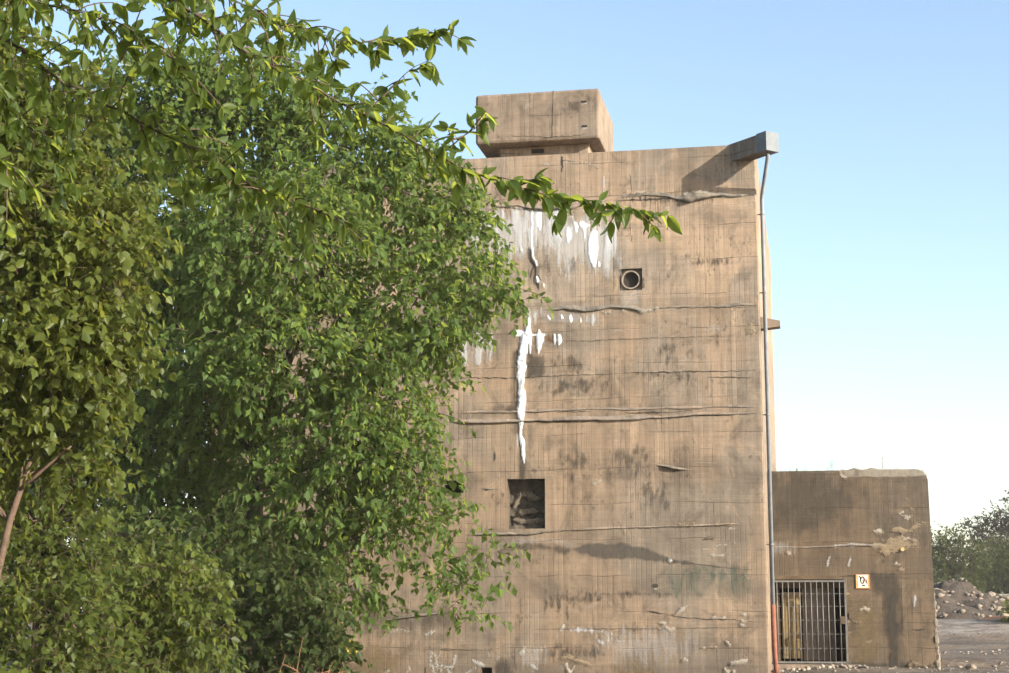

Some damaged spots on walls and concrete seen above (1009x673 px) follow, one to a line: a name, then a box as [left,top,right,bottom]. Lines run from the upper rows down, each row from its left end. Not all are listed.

water stain [480,209,616,269]
water stain [460,332,493,364]
water stain [511,312,594,479]
water stain [575,543,691,564]